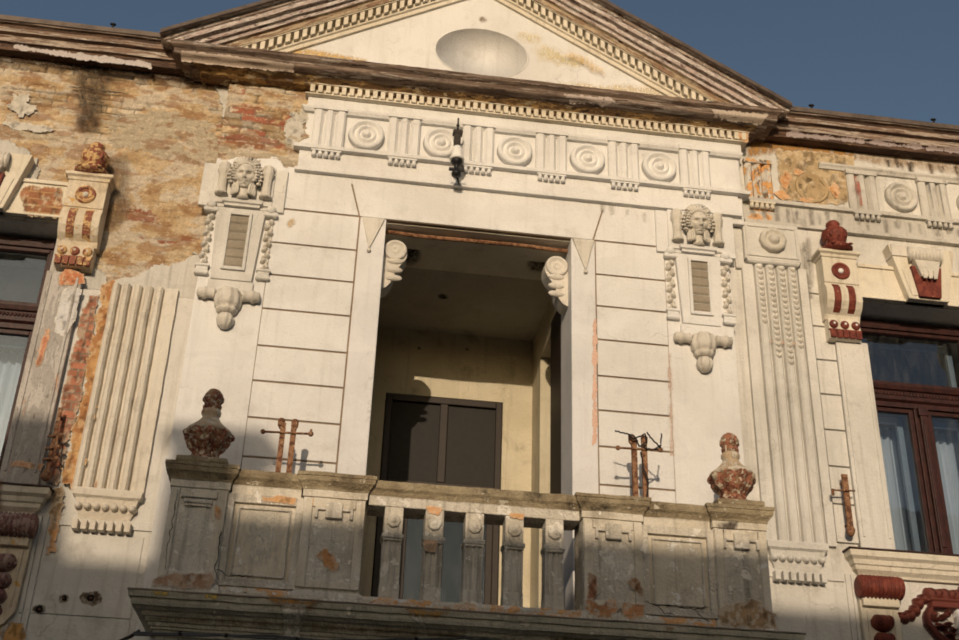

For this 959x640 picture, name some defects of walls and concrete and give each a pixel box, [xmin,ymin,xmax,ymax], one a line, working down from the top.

damp [0,56,226,129]
flaking render [712,109,959,205]
peeling [747,208,774,221]
flaking render [0,44,310,554]
flaking render [316,548,339,571]
spalling [59,591,103,606]
flaking render [517,573,645,620]
flaking render [718,598,778,630]
flaking render [0,621,27,640]